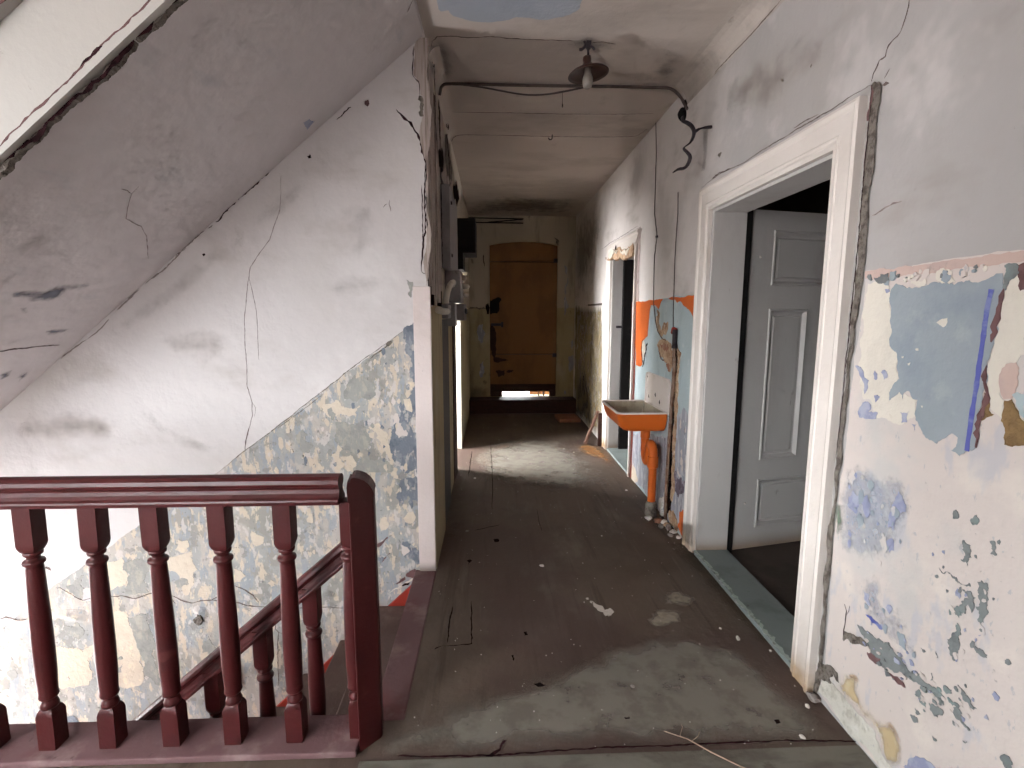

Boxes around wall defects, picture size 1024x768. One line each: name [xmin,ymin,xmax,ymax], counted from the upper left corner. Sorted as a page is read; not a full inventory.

crack [705,0,909,185]
crack [396,109,427,274]
crack [0,173,412,472]
peeling [215,324,420,628]
peeling [630,295,694,537]
peeling [813,81,1024,768]
peeling [0,607,41,724]
peeling [48,564,102,722]
peeling [104,525,162,721]
peeling [165,507,220,679]
peeling [241,645,260,717]
peeling [320,568,345,663]